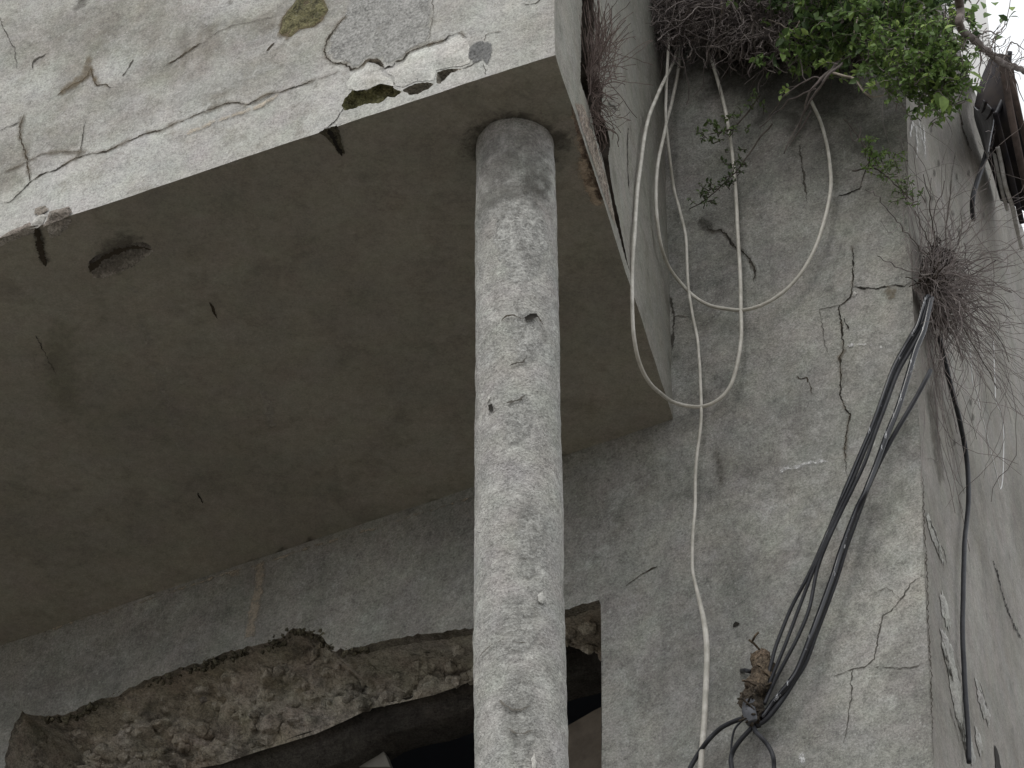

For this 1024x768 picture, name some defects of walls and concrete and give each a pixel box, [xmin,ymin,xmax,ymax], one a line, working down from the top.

spalling [278,0,328,37]
flaking render [329,0,430,67]
crack [0,0,502,203]
spalling [342,69,461,110]
spalling [0,206,72,266]
spalling [88,239,153,278]
crack [699,219,756,282]
crack [819,249,909,474]
crack [835,477,933,741]
peeling [939,591,991,766]